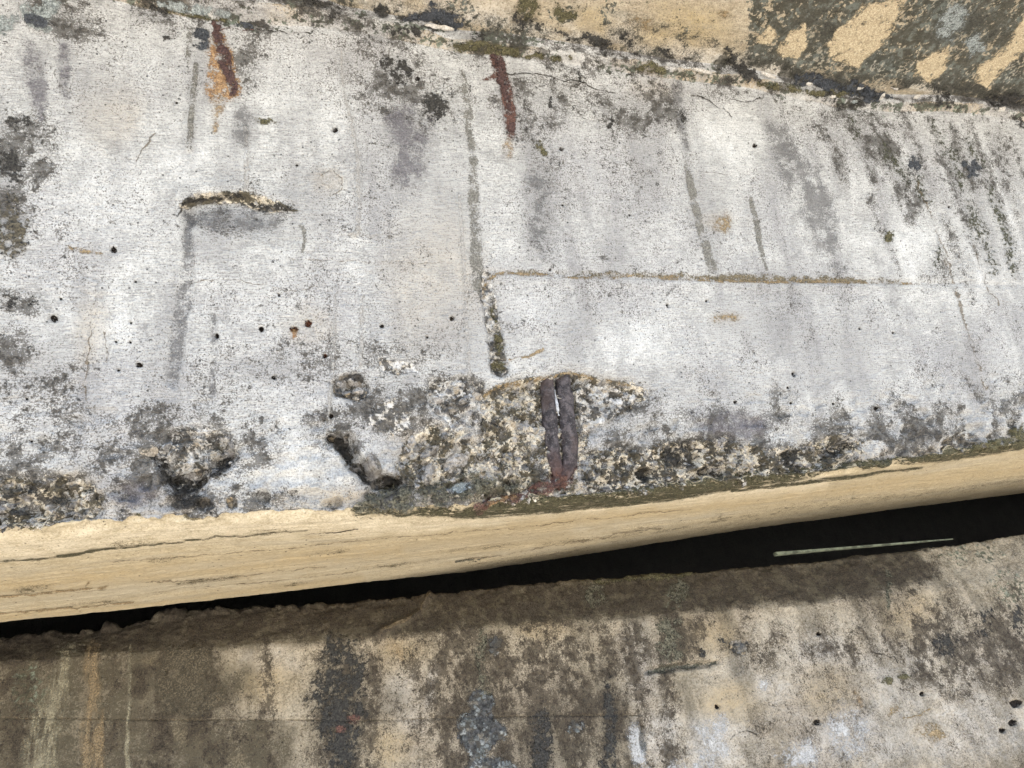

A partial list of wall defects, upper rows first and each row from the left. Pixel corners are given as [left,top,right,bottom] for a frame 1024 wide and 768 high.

rust [204,20,242,133]
rust [482,54,516,158]
spalling [179,190,299,213]
water stain [459,70,484,292]
water stain [749,197,768,271]
water stain [768,124,839,266]
spalling [0,471,105,533]
spalling [138,427,238,512]
spalling [326,371,868,506]
water stain [27,643,74,768]
water stain [82,641,104,768]
water stain [598,671,647,768]